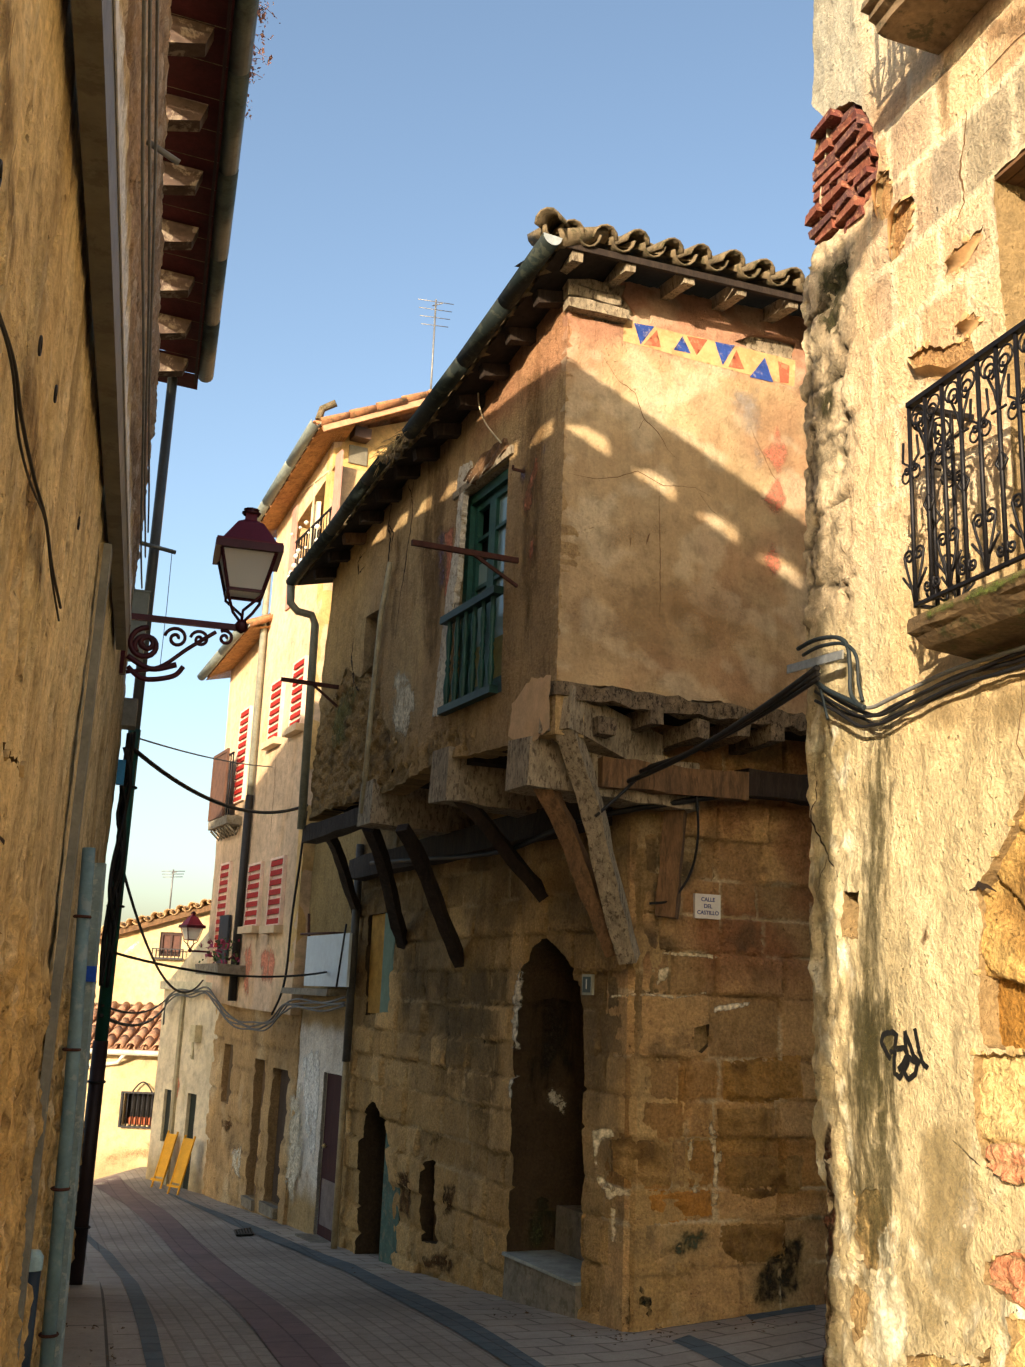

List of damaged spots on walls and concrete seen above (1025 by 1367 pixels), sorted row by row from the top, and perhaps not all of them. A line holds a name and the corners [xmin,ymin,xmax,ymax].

crack [980,32,1025,78]
flaking render [804,103,916,259]
crack [955,112,967,222]
flaking render [944,231,983,274]
flaking render [907,311,984,380]
flaking render [311,667,399,811]
leakage [848,734,908,1367]
flaking render [970,812,1025,1185]
spalling [922,1354,991,1367]
flaking render [989,1249,1025,1367]